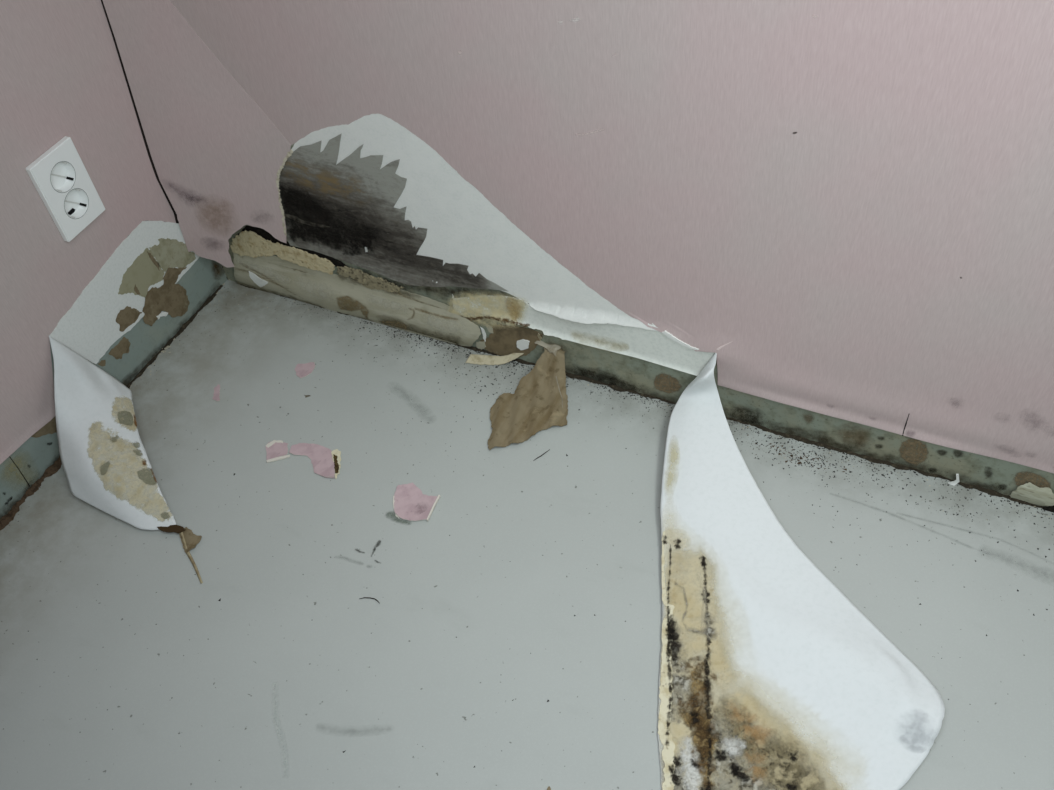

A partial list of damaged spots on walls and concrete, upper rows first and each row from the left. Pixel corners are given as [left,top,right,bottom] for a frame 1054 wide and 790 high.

peeling [143,311,168,326]
leakage [213,133,507,347]
peeling [476,324,493,350]
peeling [516,339,530,350]
peeling [49,336,203,583]
peeling [658,353,945,790]